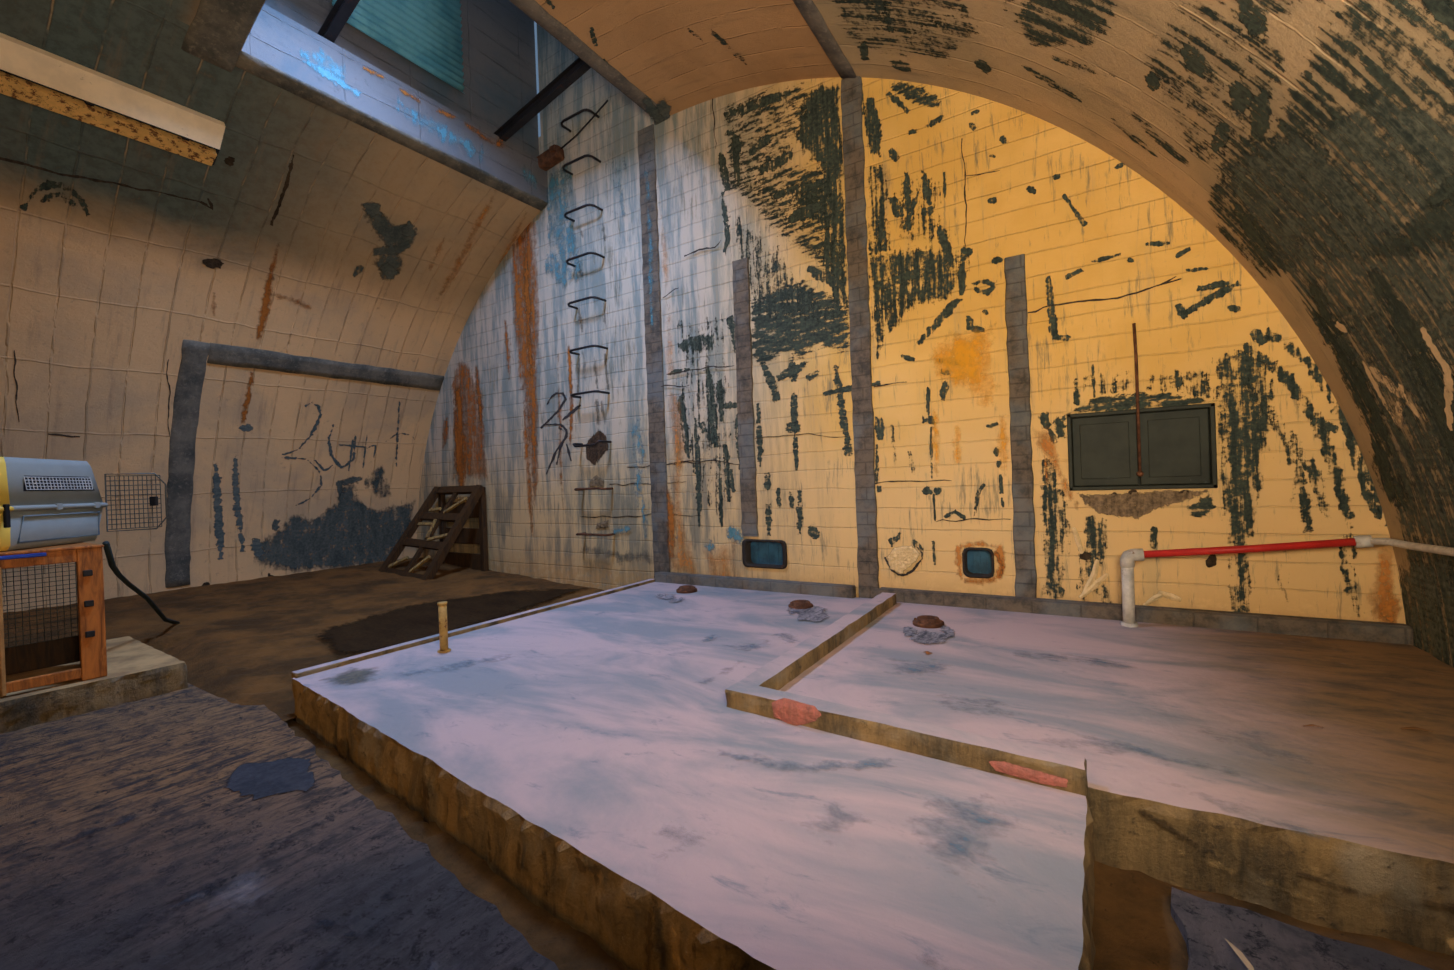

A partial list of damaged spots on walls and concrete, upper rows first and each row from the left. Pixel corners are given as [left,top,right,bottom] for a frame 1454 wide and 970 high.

peeling [1004,0,1117,103]
peeling [832,0,1003,361]
rust [241,372,254,422]
rust [257,251,310,339]
rust [443,364,486,486]
rust [500,223,538,528]
rust [558,347,573,479]
peeling [669,82,853,539]
peeling [1038,0,1454,667]
damp [212,456,413,571]
spalling [772,698,821,726]
damp [225,757,315,801]